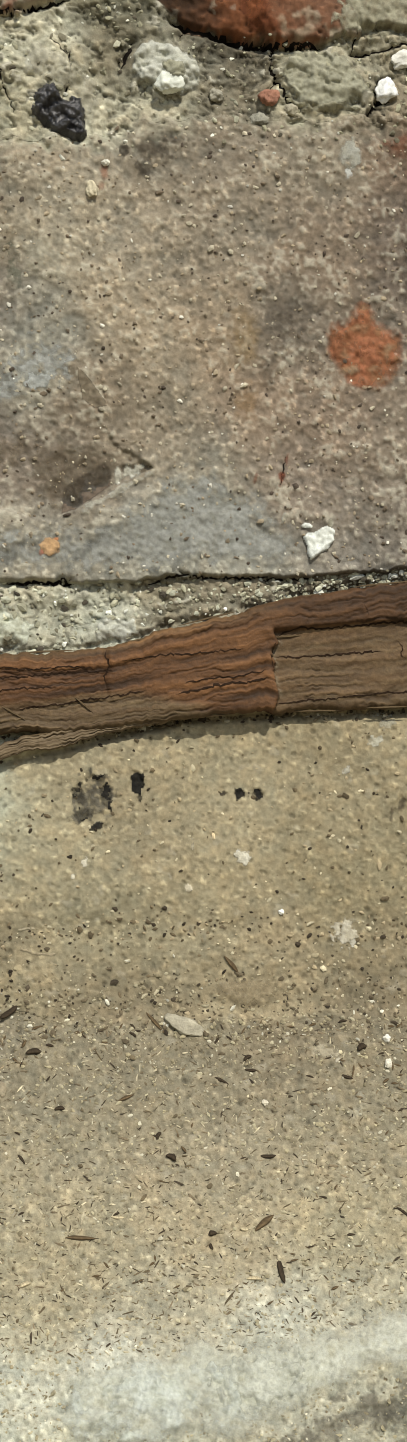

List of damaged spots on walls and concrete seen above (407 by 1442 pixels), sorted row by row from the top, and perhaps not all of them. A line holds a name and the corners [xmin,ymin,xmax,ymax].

crack [8,577,74,588]
crack [148,573,309,585]